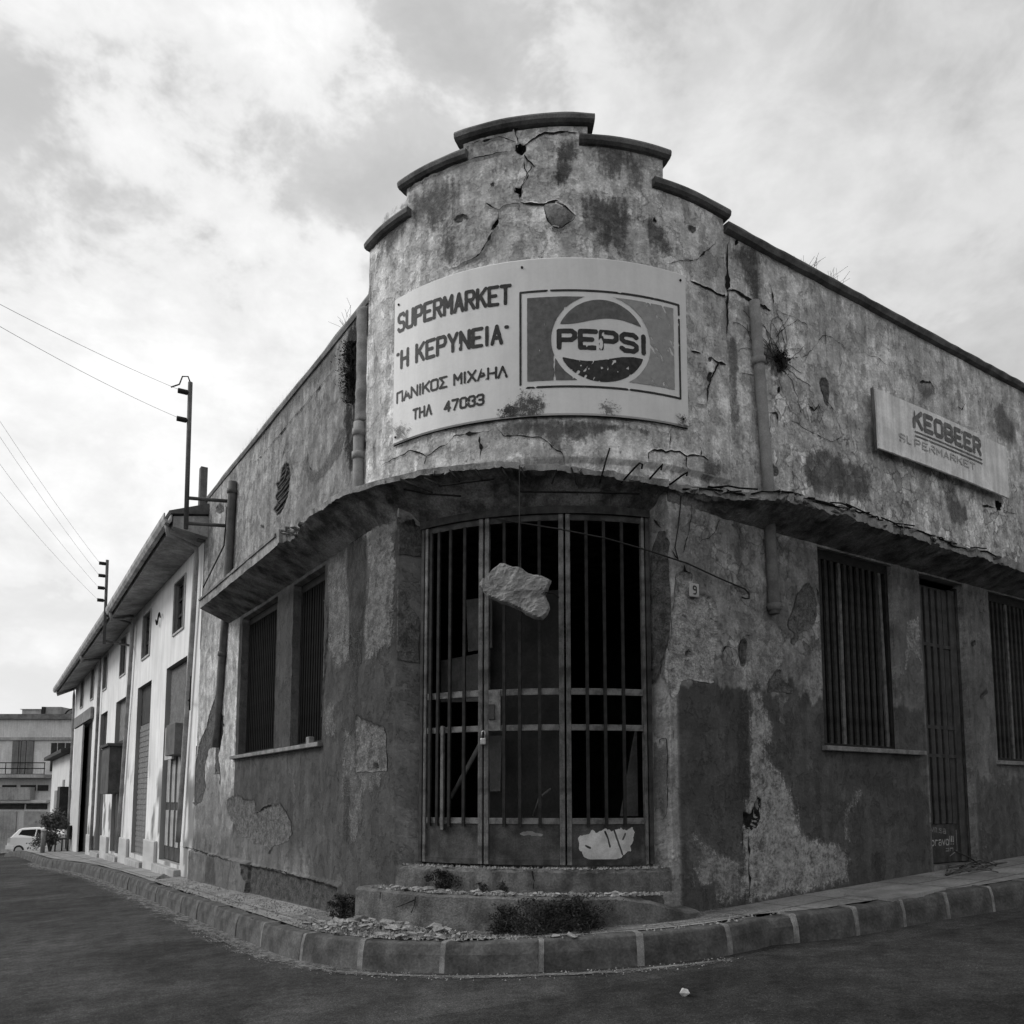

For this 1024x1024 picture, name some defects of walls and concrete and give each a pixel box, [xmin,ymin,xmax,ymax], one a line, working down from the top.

crack [408,128,577,270]
crack [672,242,845,442]
spalling [192,695,224,806]
spalling [226,794,292,851]
spalling [324,707,387,841]
crack [745,835,753,897]
peeling [695,583,848,904]